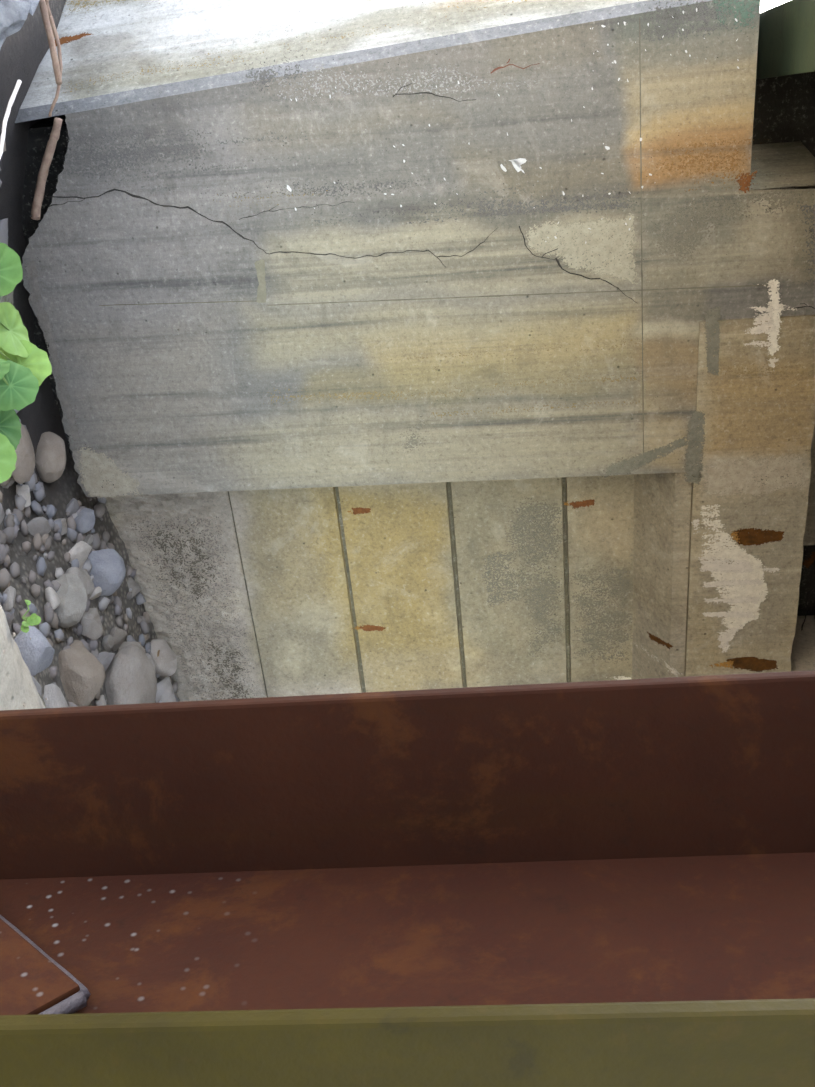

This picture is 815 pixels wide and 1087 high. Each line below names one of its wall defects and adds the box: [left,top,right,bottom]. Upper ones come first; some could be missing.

rust [55,32,93,46]
water stain [56,122,308,194]
rust [651,125,765,193]
water stain [199,178,639,228]
crack [47,189,637,303]
spalling [526,213,639,284]
water stain [643,184,815,296]
water stain [725,304,814,388]
rust [730,528,784,546]
water stain [698,557,780,653]
rust [710,657,778,672]